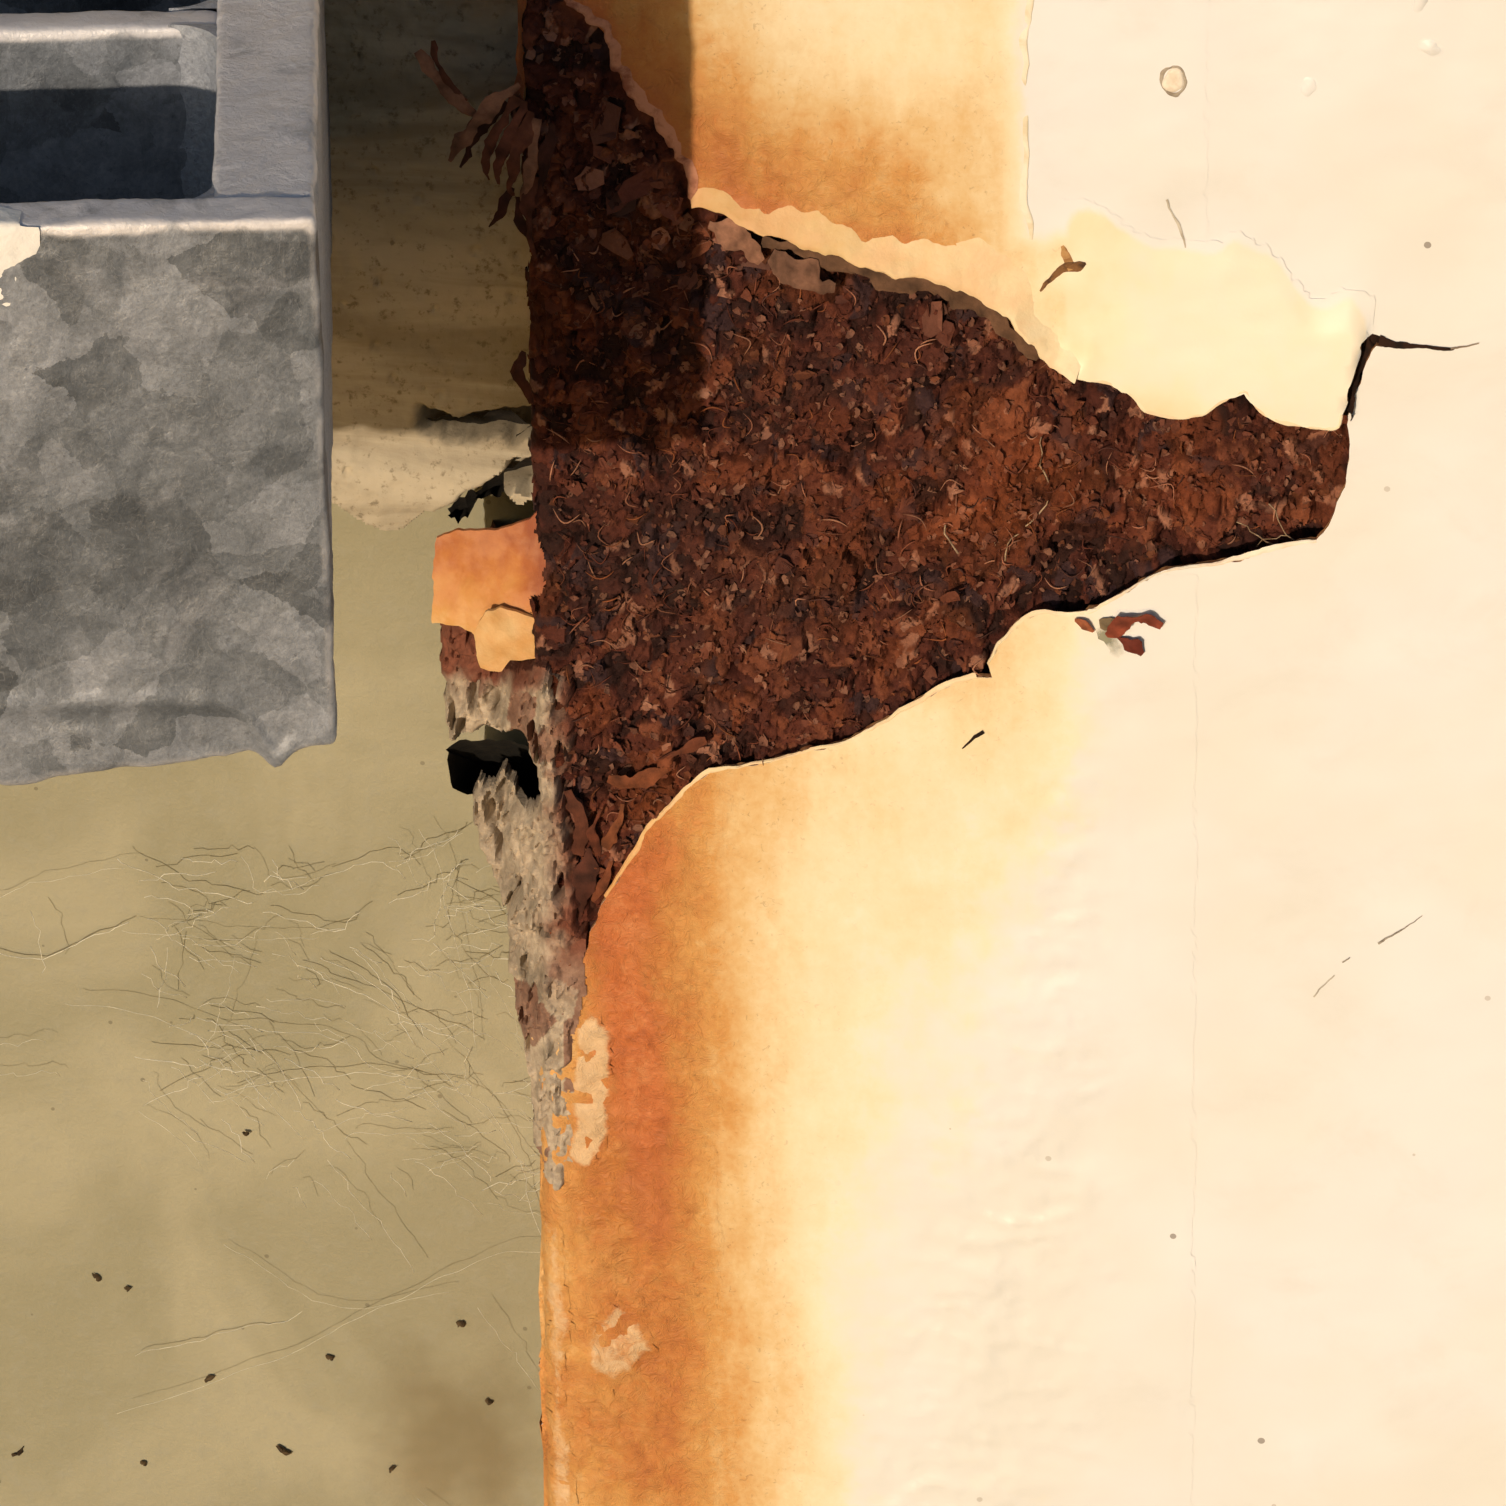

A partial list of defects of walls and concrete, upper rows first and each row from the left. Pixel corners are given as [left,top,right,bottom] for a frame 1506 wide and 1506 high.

corrosion [573,0,1210,335]
spalling [414,0,1350,944]
crack [1343,334,1479,421]
peeling [562,1007,615,1172]